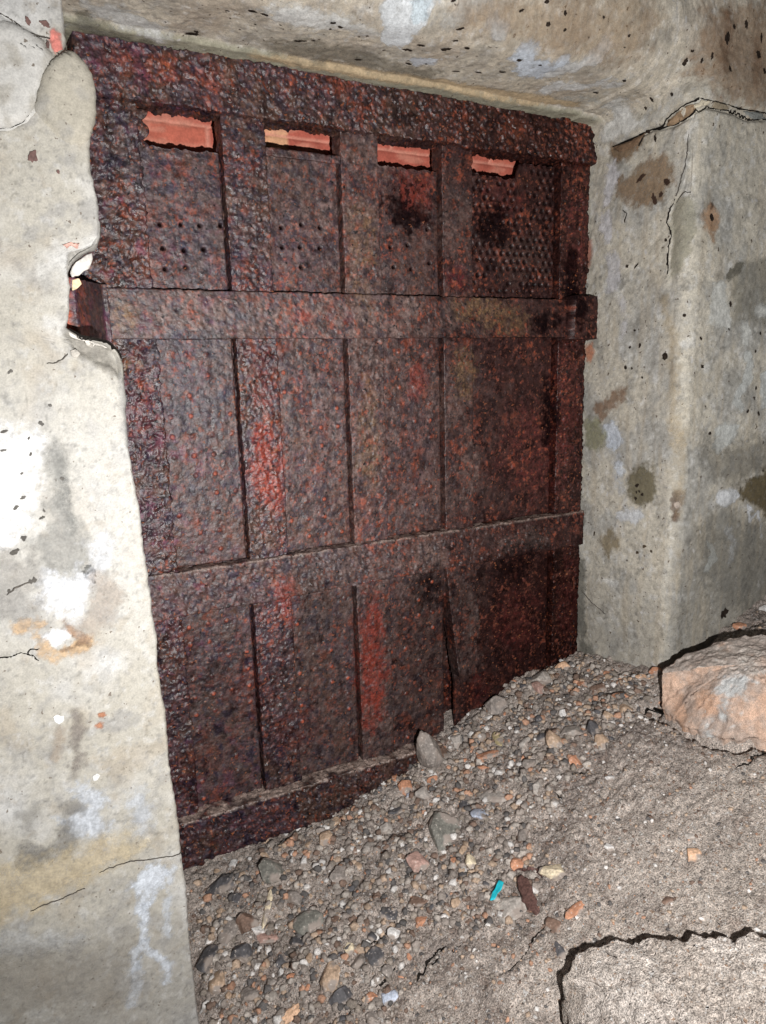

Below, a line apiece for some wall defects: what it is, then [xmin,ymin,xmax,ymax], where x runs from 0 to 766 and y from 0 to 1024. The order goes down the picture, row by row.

corrosion [251,55,577,107]
crack [612,97,766,274]
spalling [63,242,97,290]
leakage [584,419,656,524]
leakage [37,451,100,647]
crack [0,649,39,661]
corrosion [13,619,92,662]
crack [30,851,182,912]
leakage [129,865,176,985]